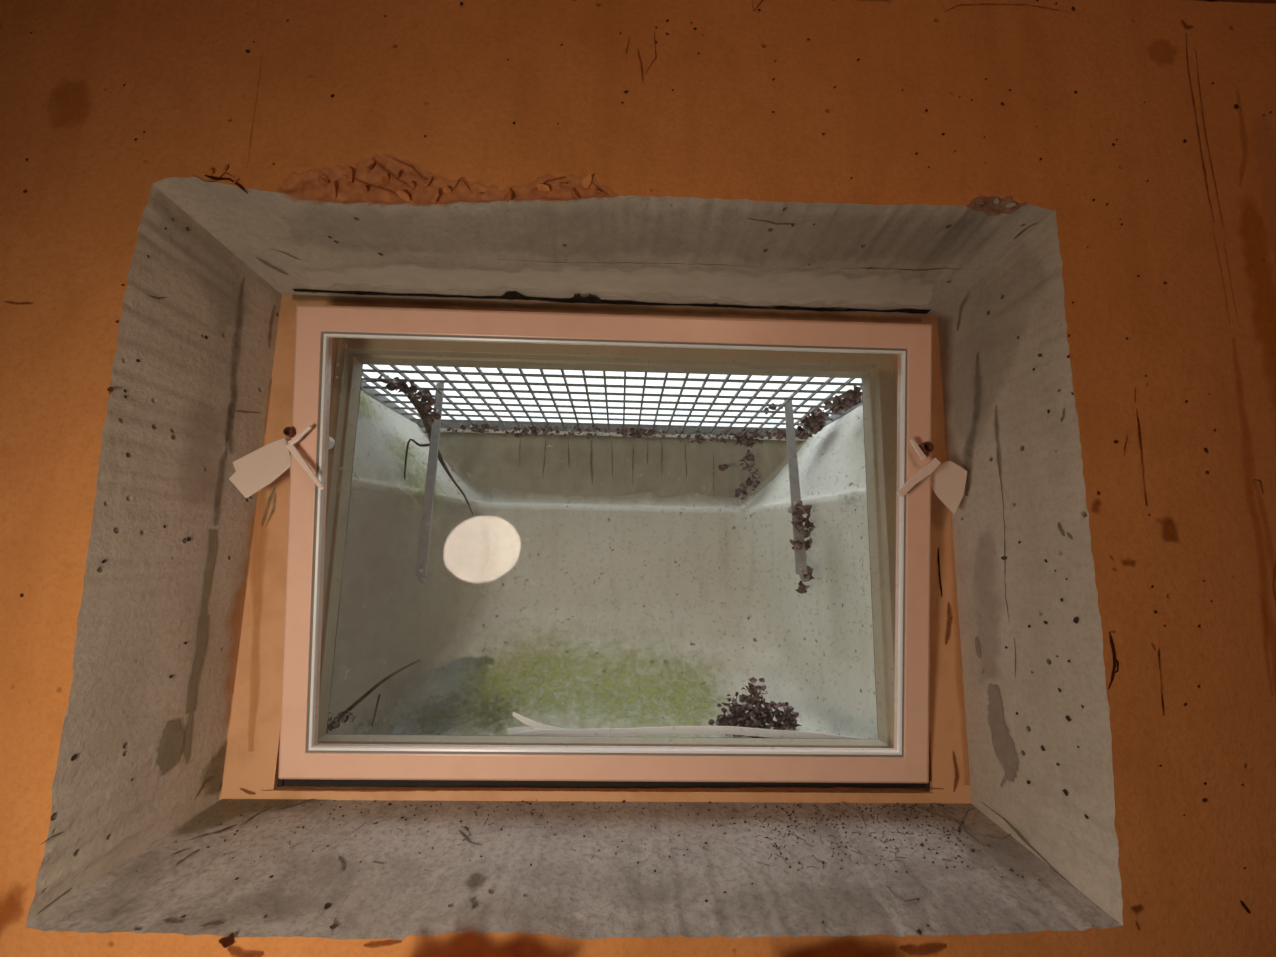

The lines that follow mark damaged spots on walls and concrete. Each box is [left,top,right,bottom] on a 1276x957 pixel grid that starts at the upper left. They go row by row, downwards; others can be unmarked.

flaking render [279,155,616,206]
flaking render [967,196,1027,216]